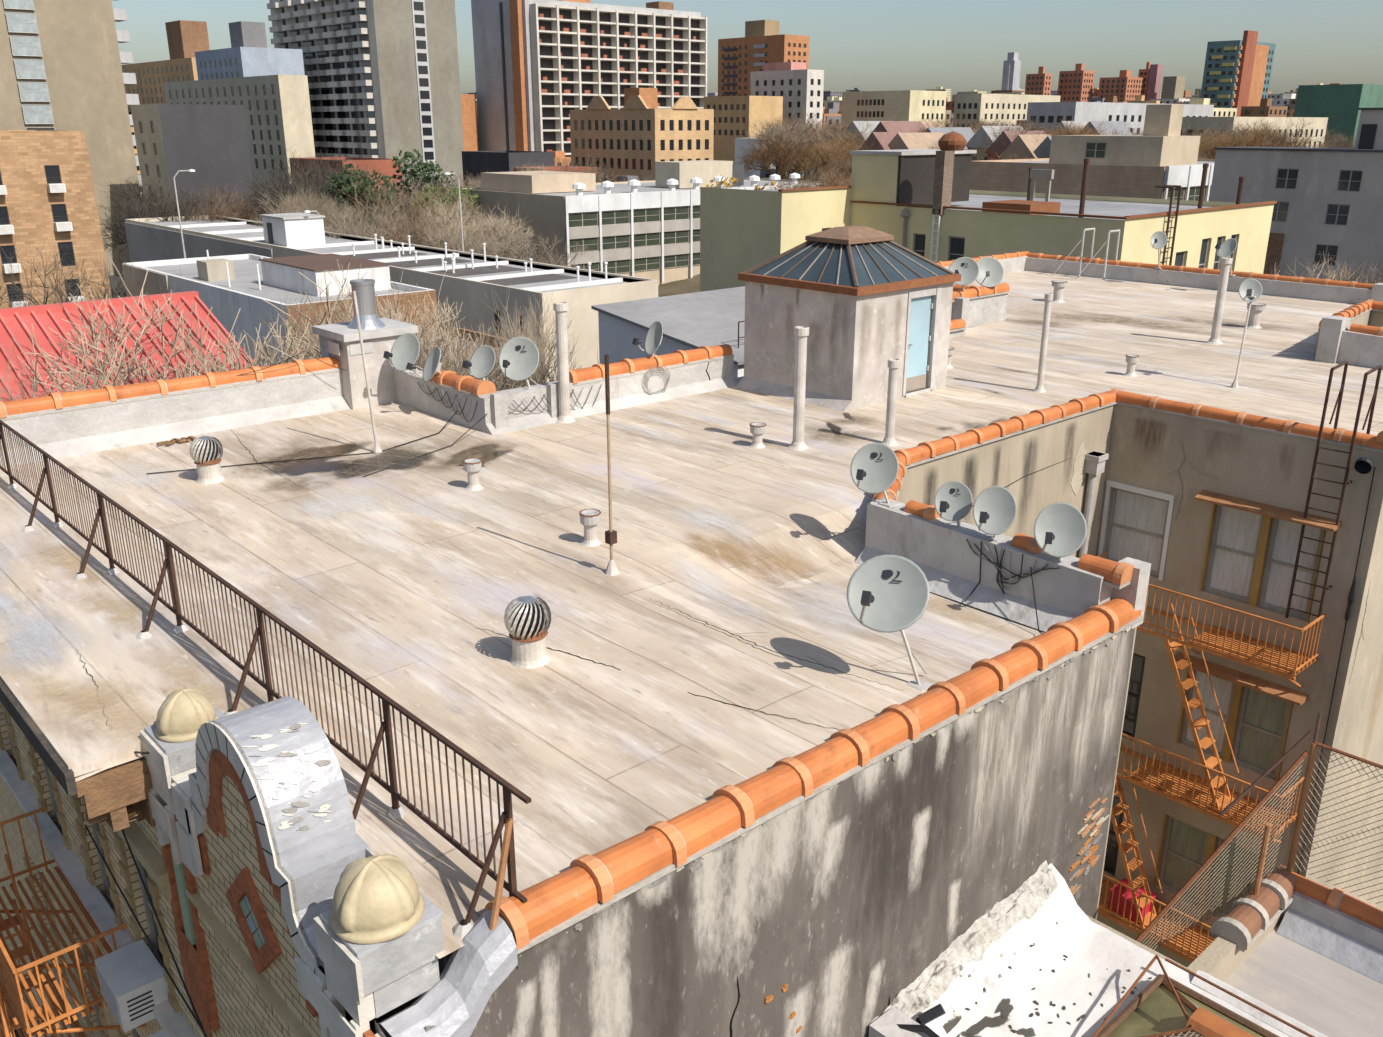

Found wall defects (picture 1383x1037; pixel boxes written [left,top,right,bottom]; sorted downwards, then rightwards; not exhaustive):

water stain [454,447,488,464]
peeling [241,723,334,831]
water stain [859,634,1127,913]
water stain [694,789,842,956]
water stain [949,883,959,931]
spalling [1069,797,1109,895]
water stain [516,961,557,1037]
water stain [590,912,630,1037]
crack [730,977,740,1037]
water stain [786,946,852,1037]
water stain [863,965,880,1026]